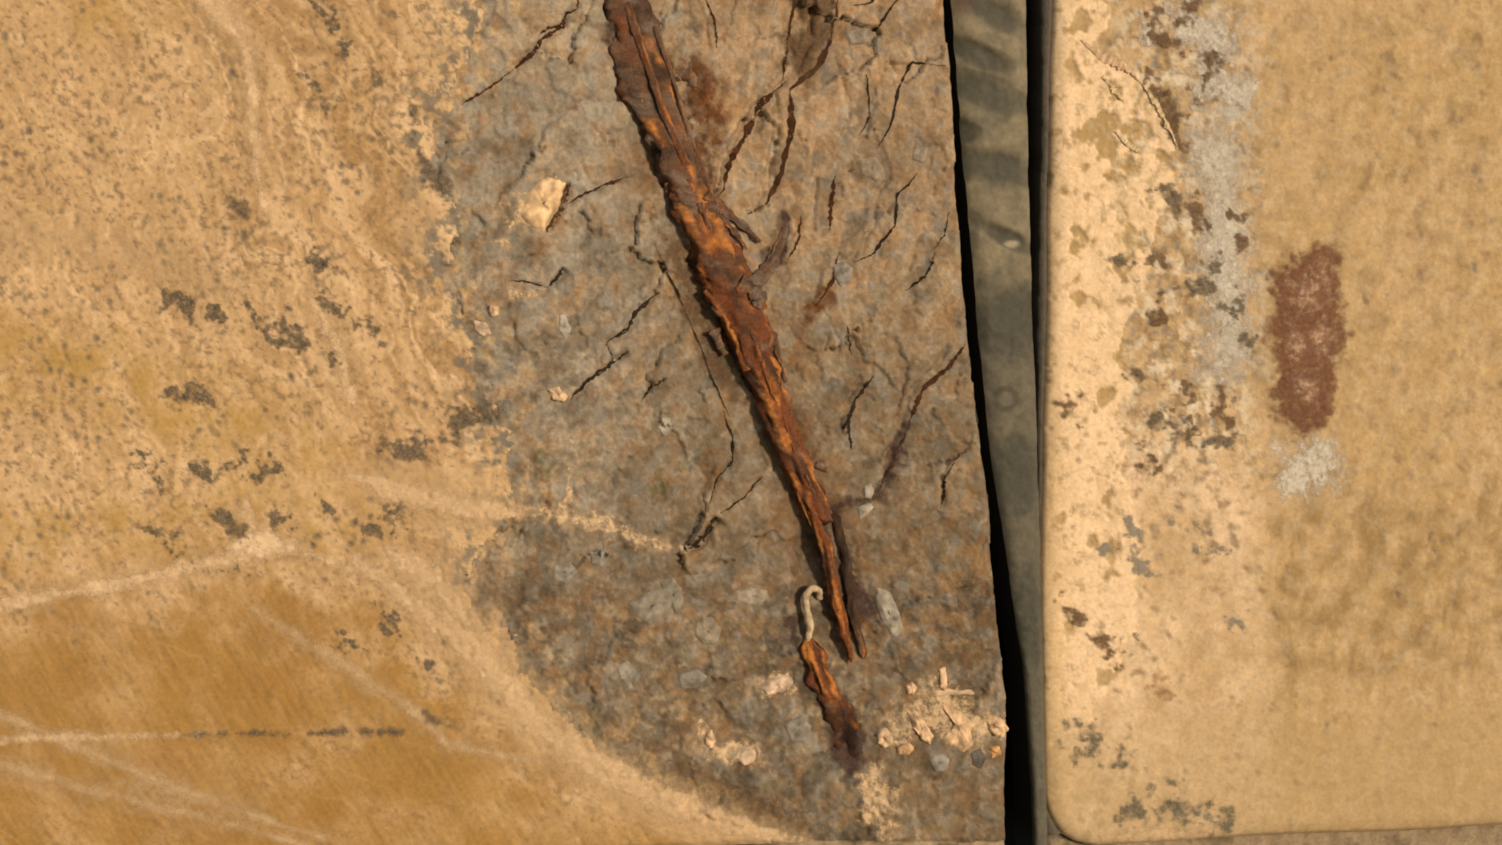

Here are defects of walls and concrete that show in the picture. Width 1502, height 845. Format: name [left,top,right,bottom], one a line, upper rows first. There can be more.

crack [461,0,580,106]
crack [546,177,626,232]
rust [652,25,791,309]
crack [718,0,917,306]
water stain [1109,253,1166,269]
water stain [1135,0,1262,475]
crack [571,247,763,550]
spalling [427,0,1009,843]
rust [703,289,814,530]
rust [831,423,910,513]
water stain [1268,437,1349,500]
rust [829,696,867,777]